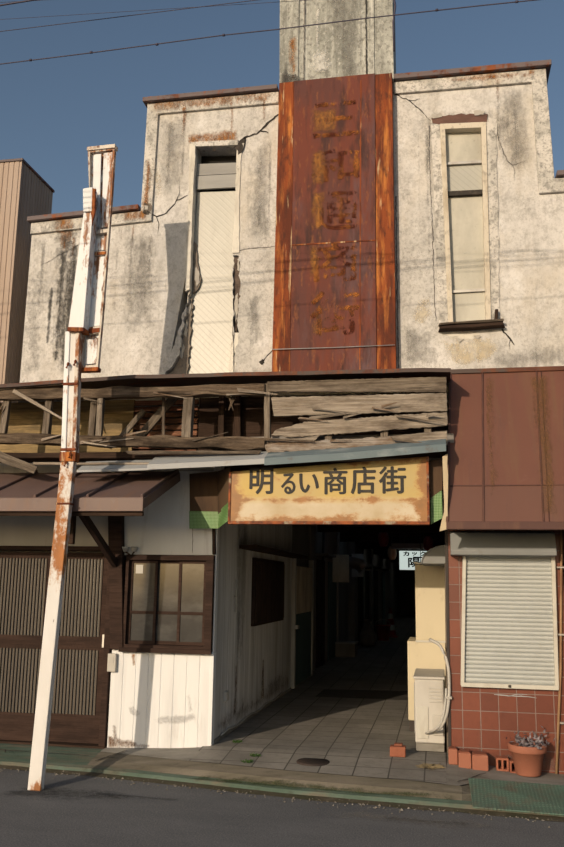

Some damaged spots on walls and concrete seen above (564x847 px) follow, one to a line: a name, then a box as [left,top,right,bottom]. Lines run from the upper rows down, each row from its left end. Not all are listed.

rust [189,131,235,142]
crack [232,114,278,154]
crack [147,186,188,230]
water stain [46,230,77,365]
flaking render [169,242,202,374]
flaking render [233,257,241,333]